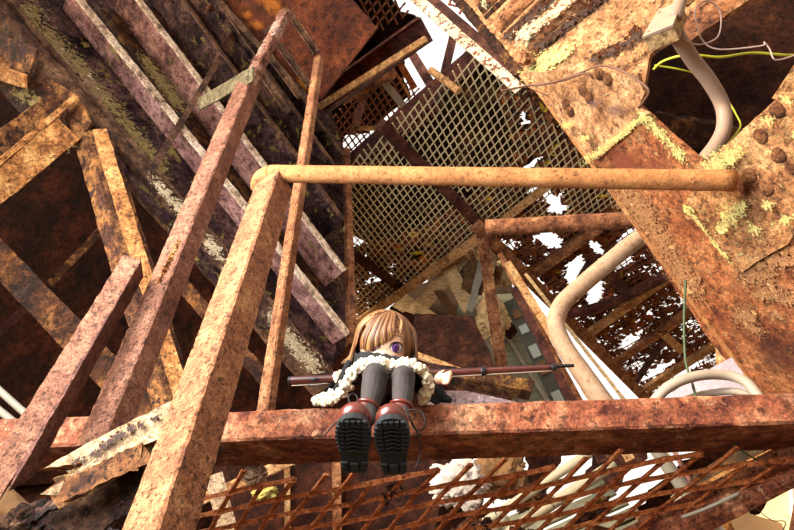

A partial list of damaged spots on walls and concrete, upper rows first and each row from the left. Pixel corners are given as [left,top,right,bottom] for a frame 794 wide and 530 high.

rust [503,0,556,41]
peeling [507,0,576,47]
peeling [9,85,43,108]
peeling [19,0,183,217]
peeling [202,233,229,270]
peeling [600,189,719,316]
peeling [682,200,794,343]
rust [14,443,151,521]
rust [211,465,266,483]
rust [230,459,489,530]
rust [525,456,561,485]
rust [617,479,674,528]